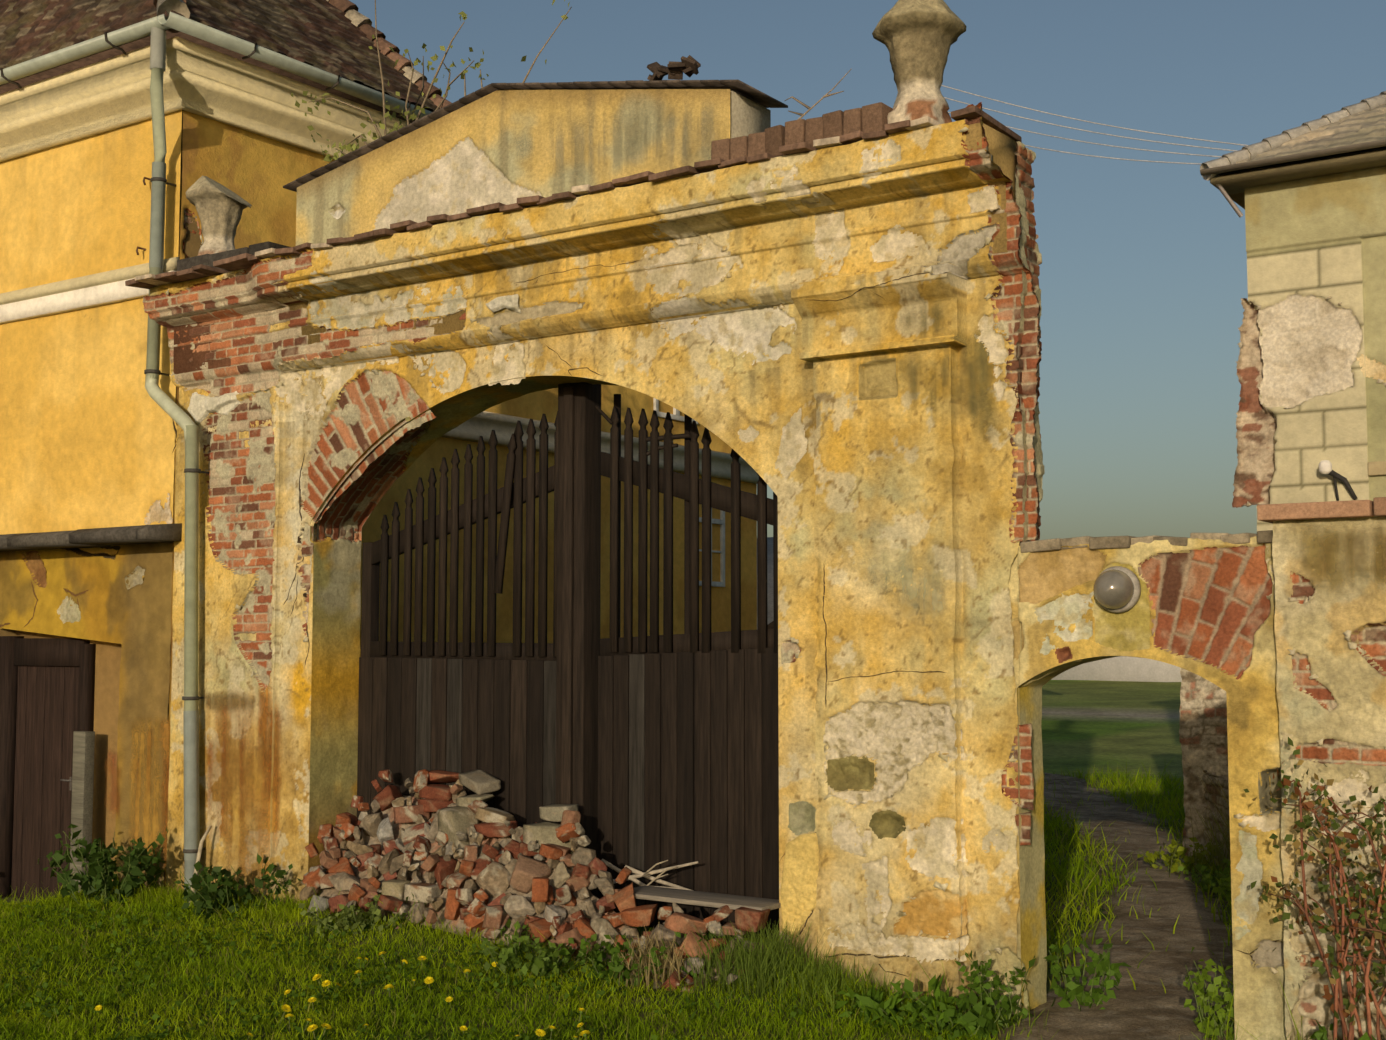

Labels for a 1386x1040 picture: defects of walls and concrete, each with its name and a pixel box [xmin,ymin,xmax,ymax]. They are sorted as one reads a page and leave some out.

spalling [373,137,541,230]
flaking render [870,102,1042,543]
spalling [1232,293,1386,508]
flaking render [143,250,585,691]
crack [0,581,89,629]
leakage [206,694,254,708]
crack [823,564,946,708]
flaking render [1138,543,1315,680]
flaking render [1288,648,1339,712]
flaking render [1343,622,1386,676]
spalling [823,700,1034,964]
spalling [974,947,1030,1015]